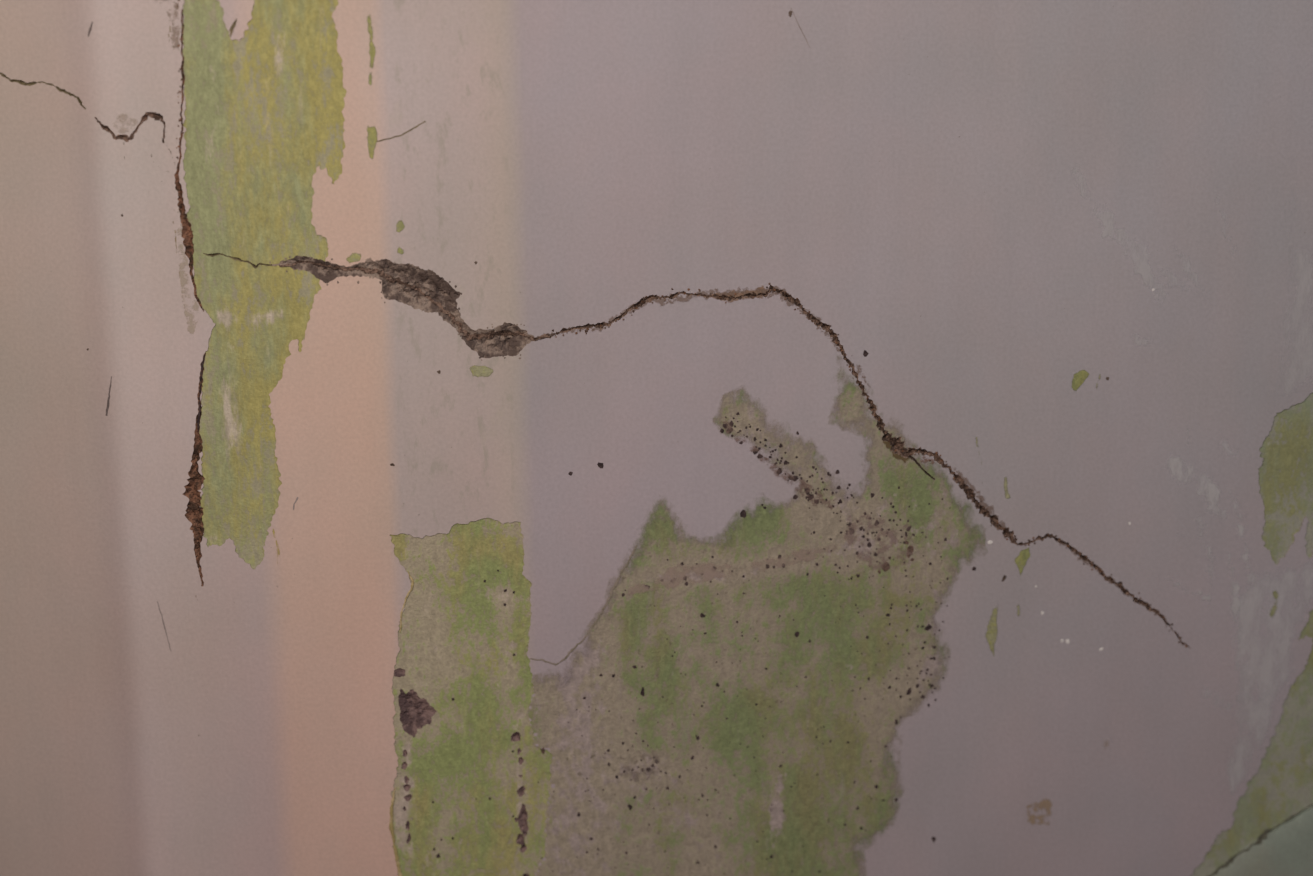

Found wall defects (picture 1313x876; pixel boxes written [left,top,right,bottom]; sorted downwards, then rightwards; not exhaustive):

peeling [367,16,375,85]
peeling [367,127,377,159]
peeling [181,0,347,569]
crack [0,0,1191,649]
peeling [1258,393,1313,565]
peeling [389,374,985,876]
peeling [1190,610,1313,876]